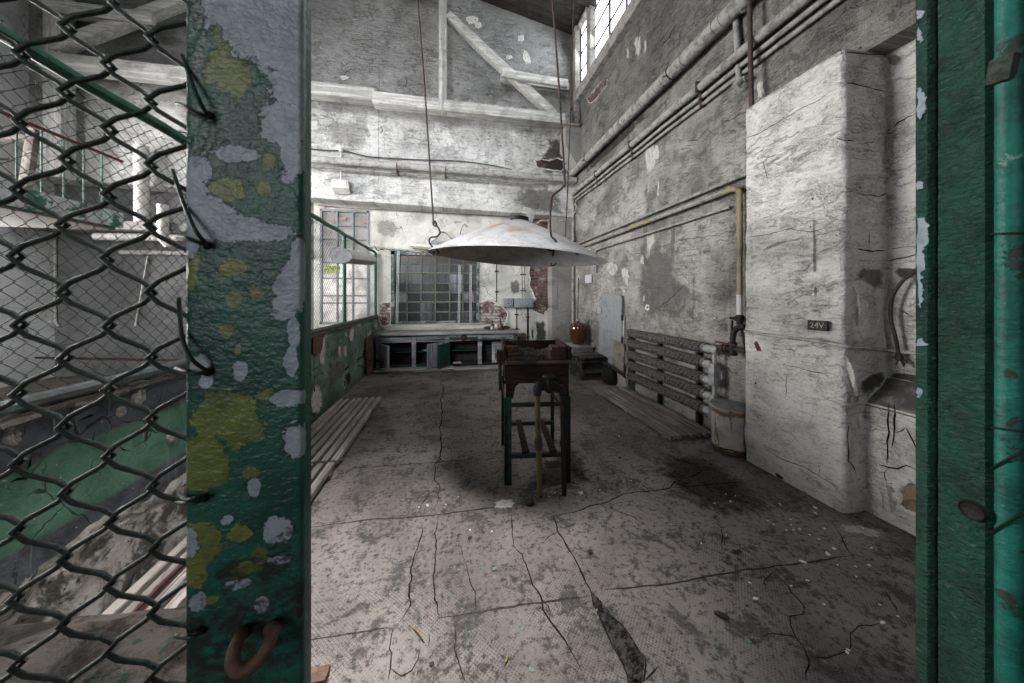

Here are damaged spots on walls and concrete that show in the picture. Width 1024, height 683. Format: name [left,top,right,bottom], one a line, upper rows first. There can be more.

flaking render [533,157,567,172]
flaking render [478,299,509,326]
flaking render [527,267,548,316]
peeling [319,327,354,367]
peeling [311,384,323,415]
crack [881,404,916,484]
flaking render [891,477,916,521]
crack [388,384,476,681]
crack [511,515,584,676]
crack [545,480,679,682]
crack [718,522,898,681]